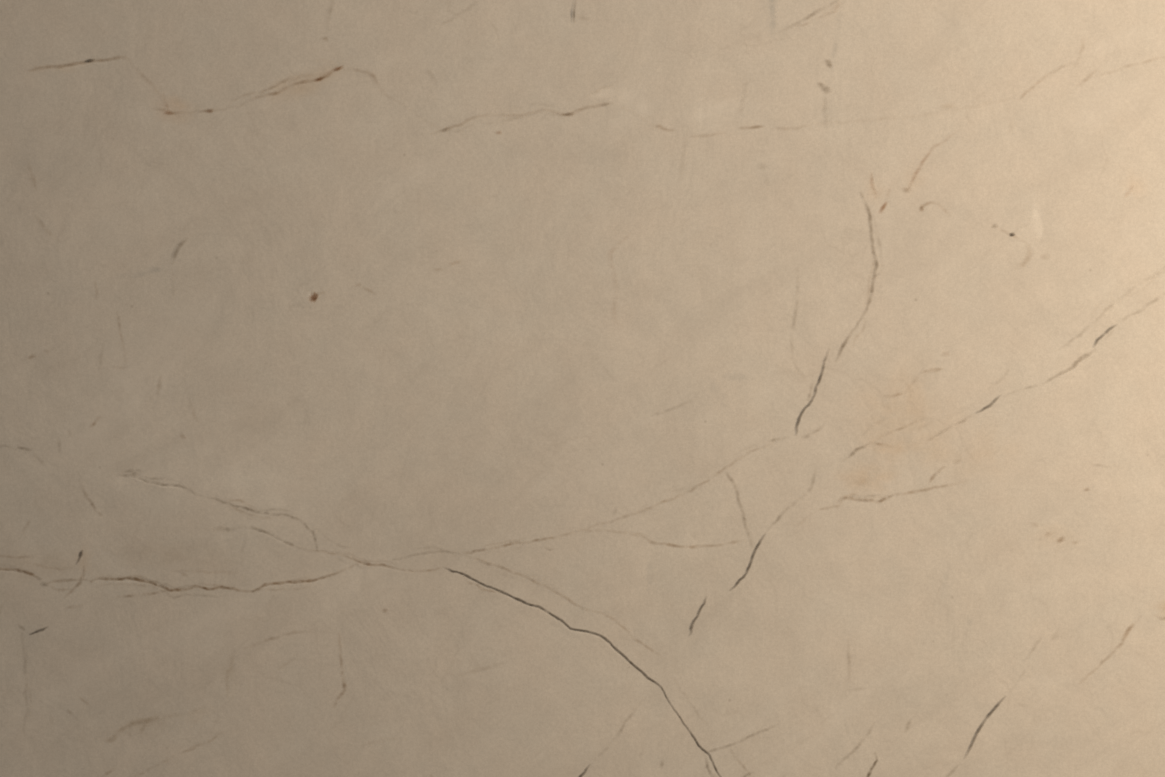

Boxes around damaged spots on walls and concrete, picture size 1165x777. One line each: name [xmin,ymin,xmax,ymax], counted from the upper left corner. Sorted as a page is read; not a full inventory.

crack [451,570,656,683]